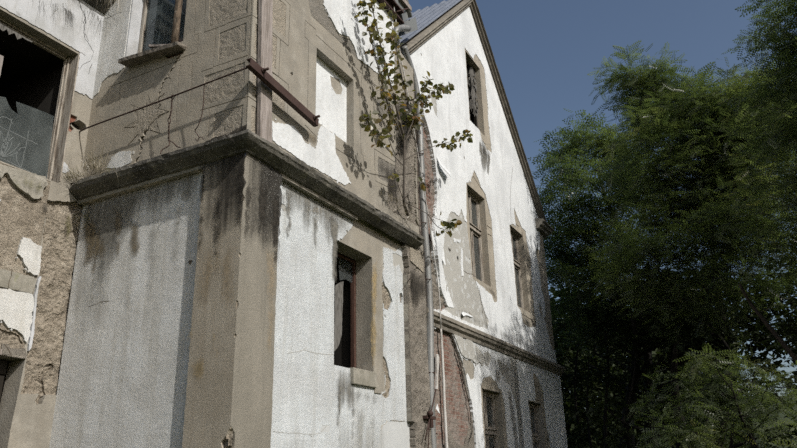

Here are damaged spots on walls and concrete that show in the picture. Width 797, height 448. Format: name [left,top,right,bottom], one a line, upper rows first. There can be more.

flaking render [0,163,50,361]
water stain [85,175,204,275]
water stain [239,185,343,277]
peeling [337,219,404,398]
peeling [387,99,497,329]
flaking render [434,329,518,448]
peeling [528,373,550,448]